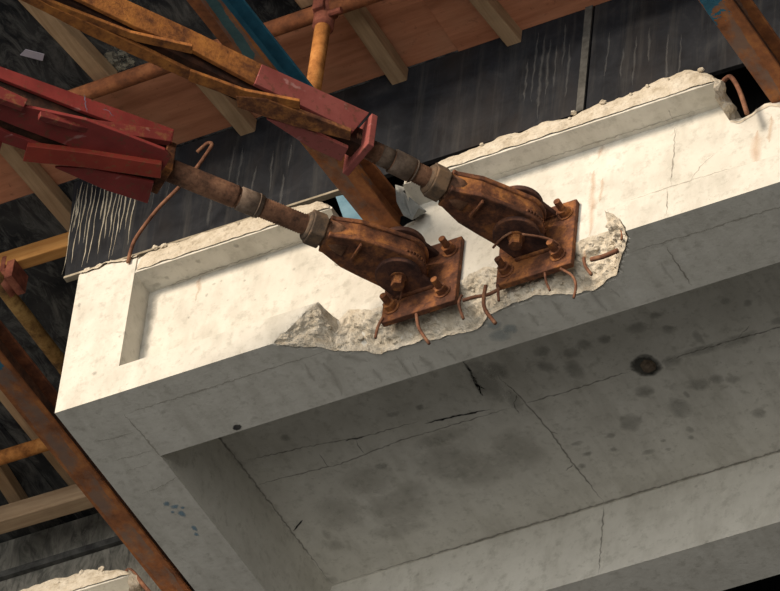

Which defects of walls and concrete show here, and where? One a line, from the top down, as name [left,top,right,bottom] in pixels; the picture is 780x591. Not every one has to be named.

spalling [438,67,780,167]
spalling [274,211,627,354]
crack [255,362,620,486]
spalling [20,566,151,591]